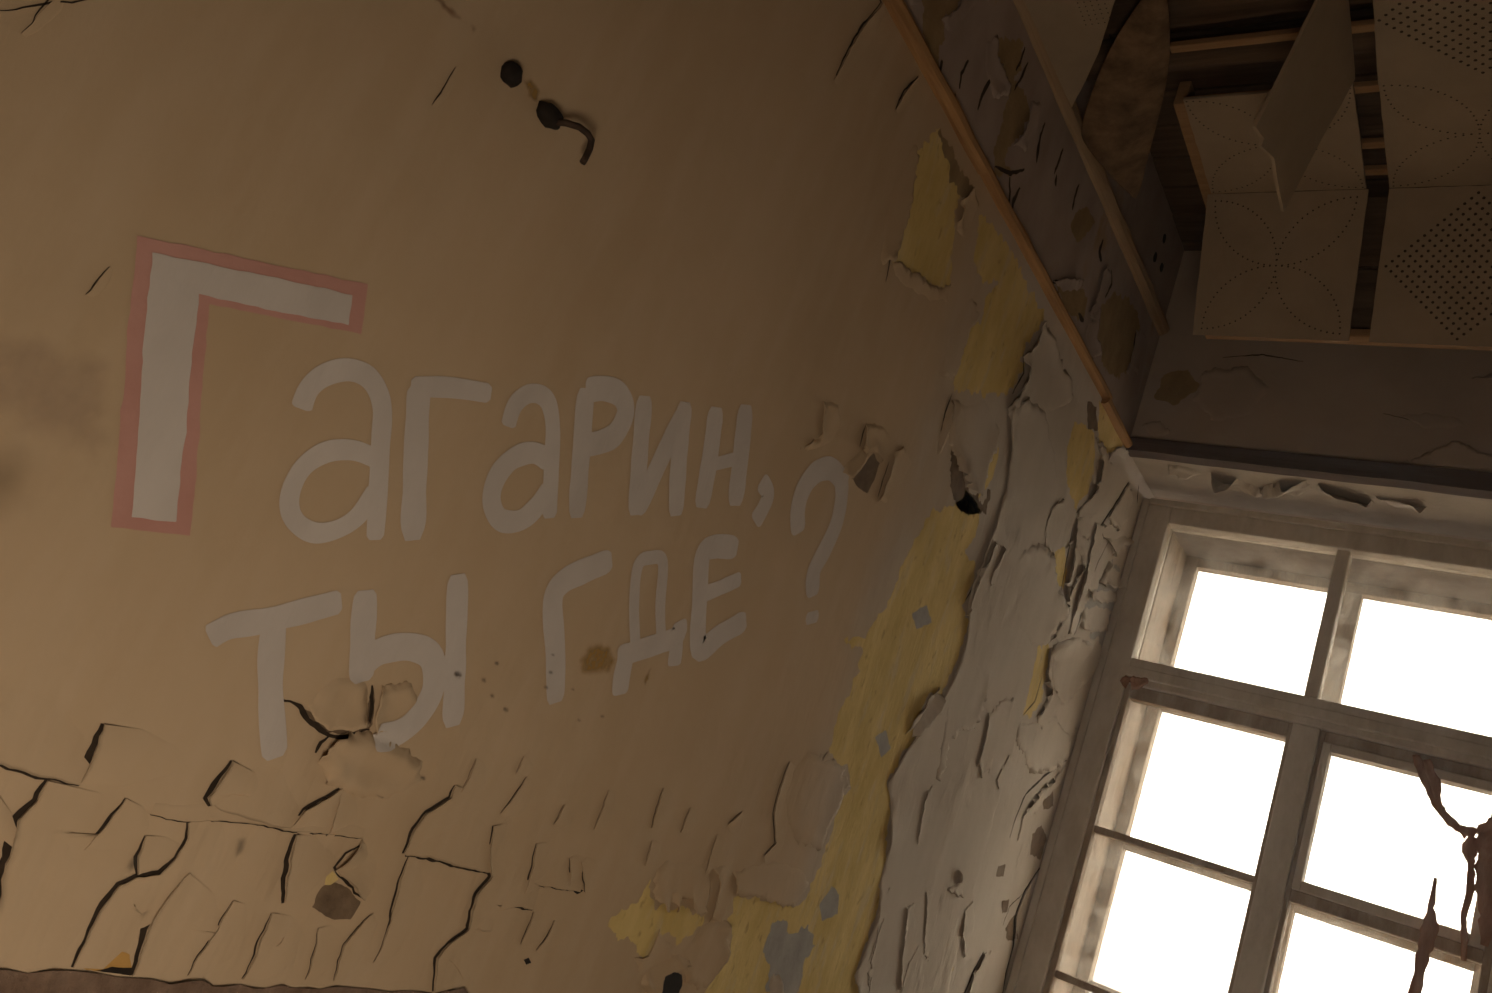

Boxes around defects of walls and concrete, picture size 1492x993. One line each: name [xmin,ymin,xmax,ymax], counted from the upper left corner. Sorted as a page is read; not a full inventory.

peeling [1168,464,1426,513]
peeling [705,128,1139,993]
peeling [284,677,423,800]
flaking render [312,839,376,920]
flaking render [0,970,424,993]
flaking render [641,954,692,993]